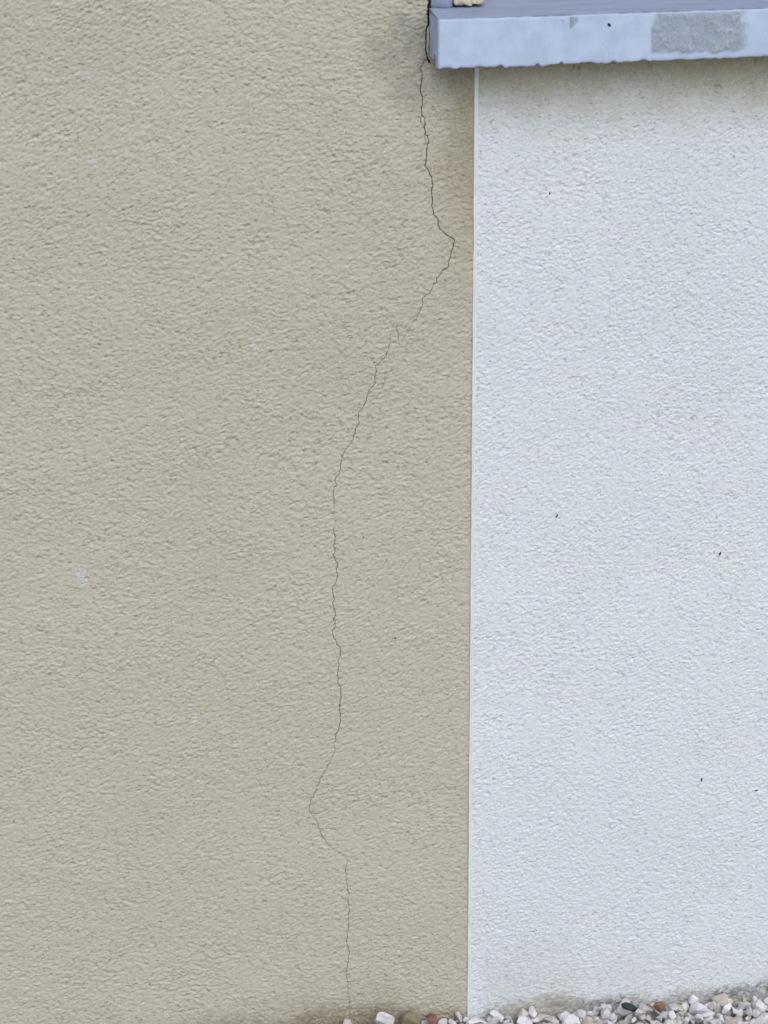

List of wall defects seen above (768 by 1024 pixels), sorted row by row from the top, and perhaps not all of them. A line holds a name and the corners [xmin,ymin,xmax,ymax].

crack [306,0,455,1013]